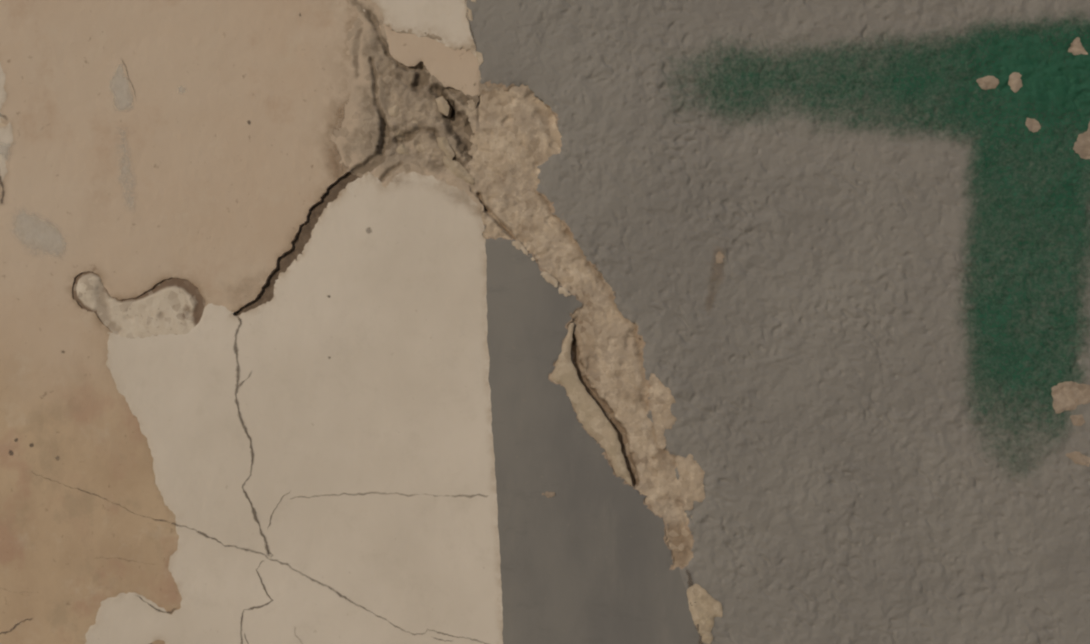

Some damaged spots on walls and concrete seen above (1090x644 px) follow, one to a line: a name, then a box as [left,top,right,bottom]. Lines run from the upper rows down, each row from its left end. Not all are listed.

peeling [1068,37,1088,55]
peeling [976,72,1023,93]
peeling [1025,118,1041,133]
peeling [1073,122,1090,159]
peeling [0,0,705,644]
crack [154,172,360,644]
peeling [1051,381,1090,426]
spalling [687,584,723,644]